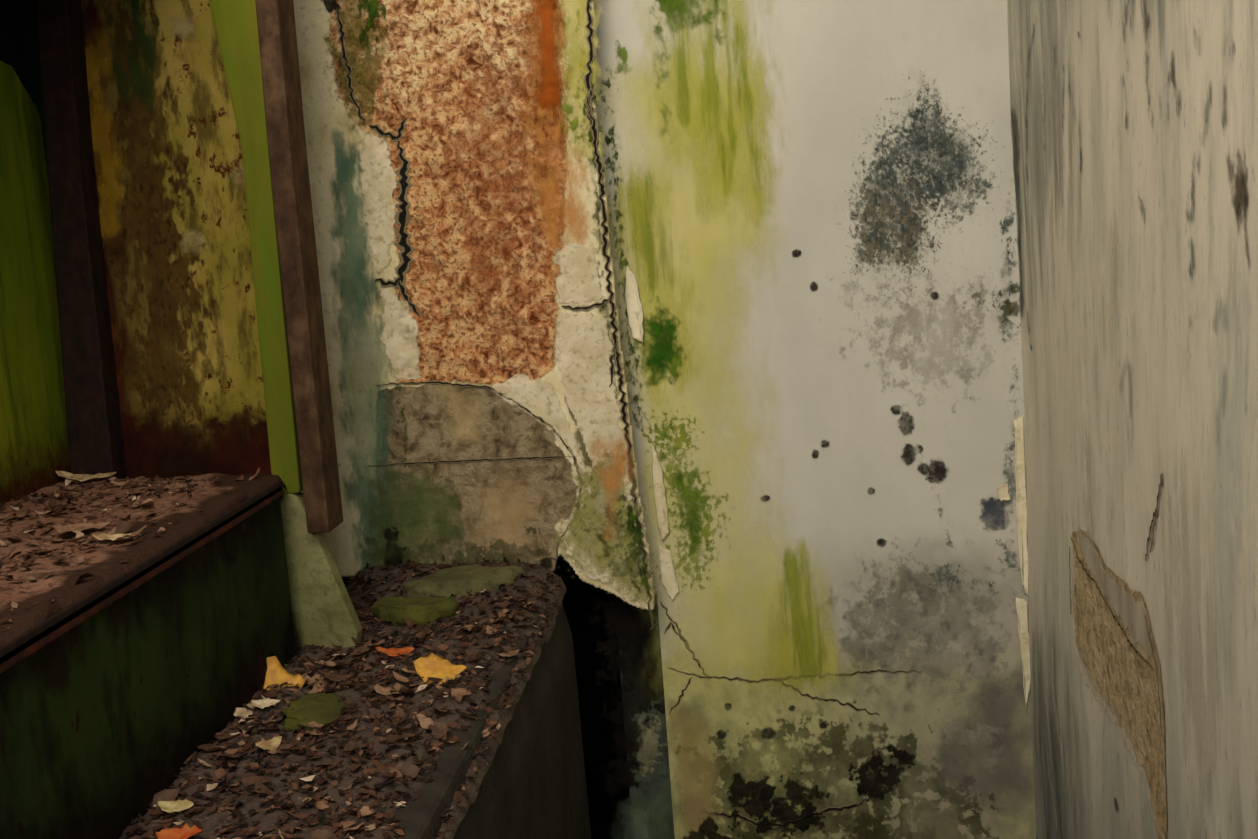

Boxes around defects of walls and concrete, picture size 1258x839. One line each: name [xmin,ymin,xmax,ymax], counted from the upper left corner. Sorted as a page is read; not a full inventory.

corrosion [131,732,165,825]
corrosion [82,0,271,478]
corrosion [210,646,268,744]
crack [336,8,419,315]
spalling [328,0,679,601]
crack [561,0,922,715]
water stain [675,705,917,839]
water stain [891,406,947,482]
water stain [842,76,1045,387]
water stain [856,436,1038,839]
peeling [997,416,1030,711]
spalling [1069,528,1167,839]